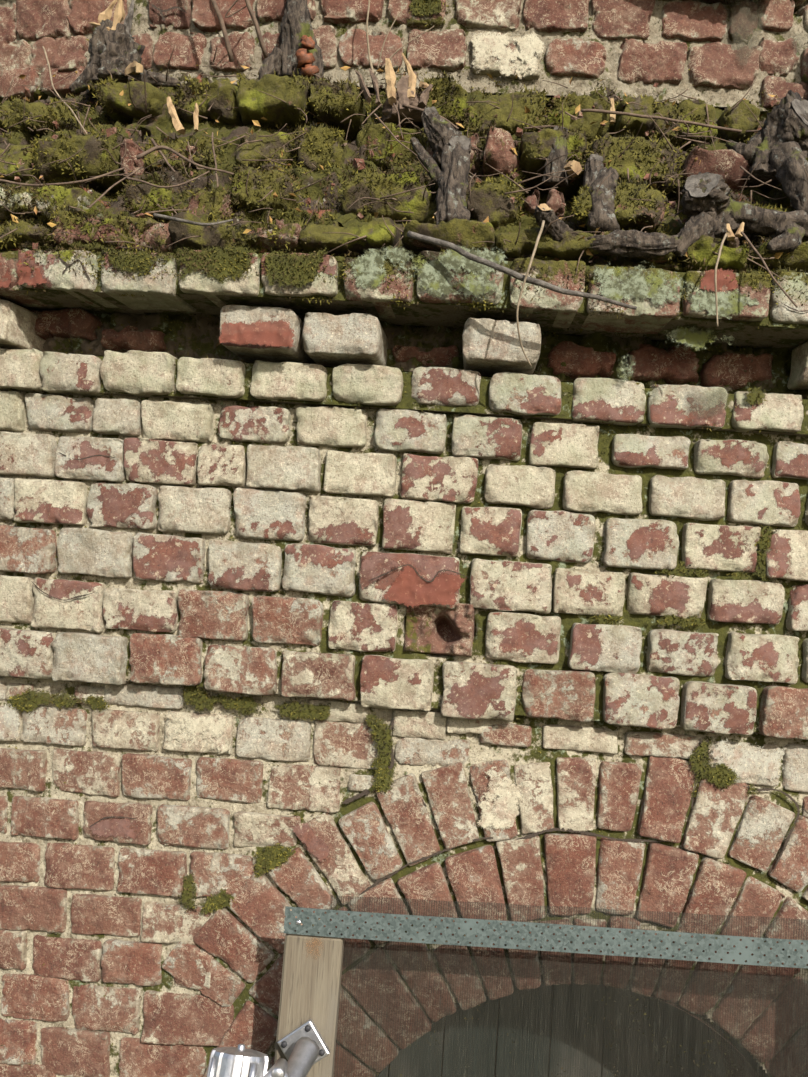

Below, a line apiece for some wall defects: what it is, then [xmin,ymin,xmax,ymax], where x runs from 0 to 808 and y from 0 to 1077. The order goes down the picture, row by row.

peeling [62,360,95,425]
peeling [15,405,289,591]
peeling [36,578,102,604]
peeling [103,597,177,632]
spalling [239,341,773,735]
peeling [681,440,808,682]
peeling [0,628,54,678]